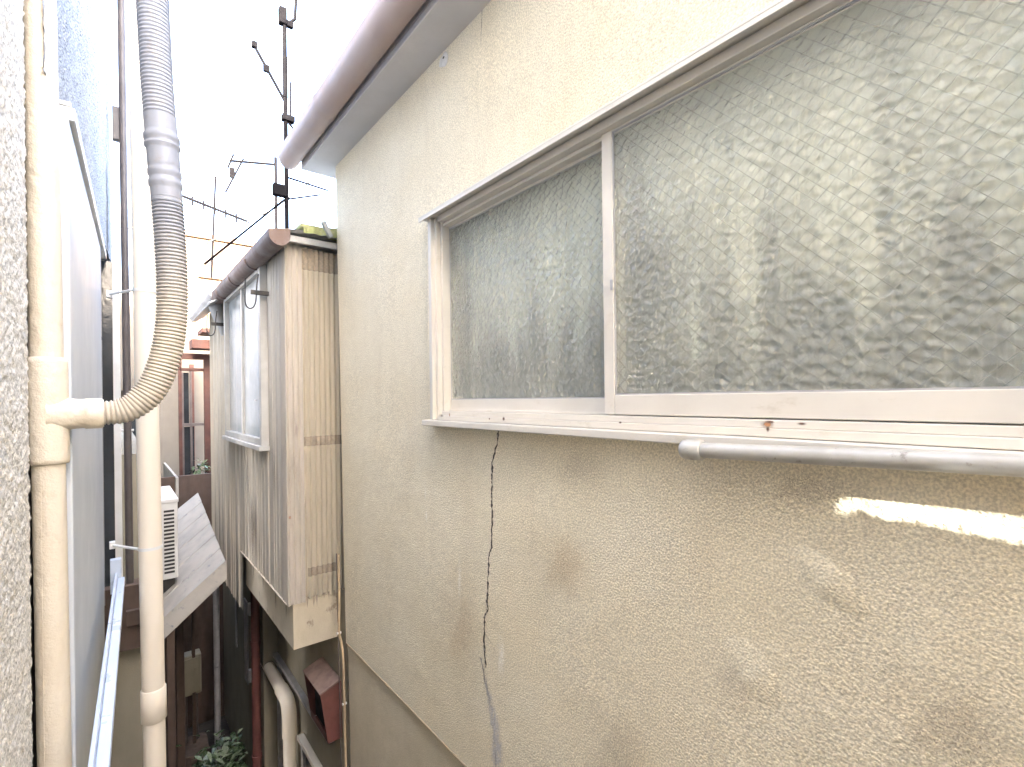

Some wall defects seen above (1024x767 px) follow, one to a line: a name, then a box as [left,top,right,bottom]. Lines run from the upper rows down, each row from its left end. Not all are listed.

crack [483,431,499,667]